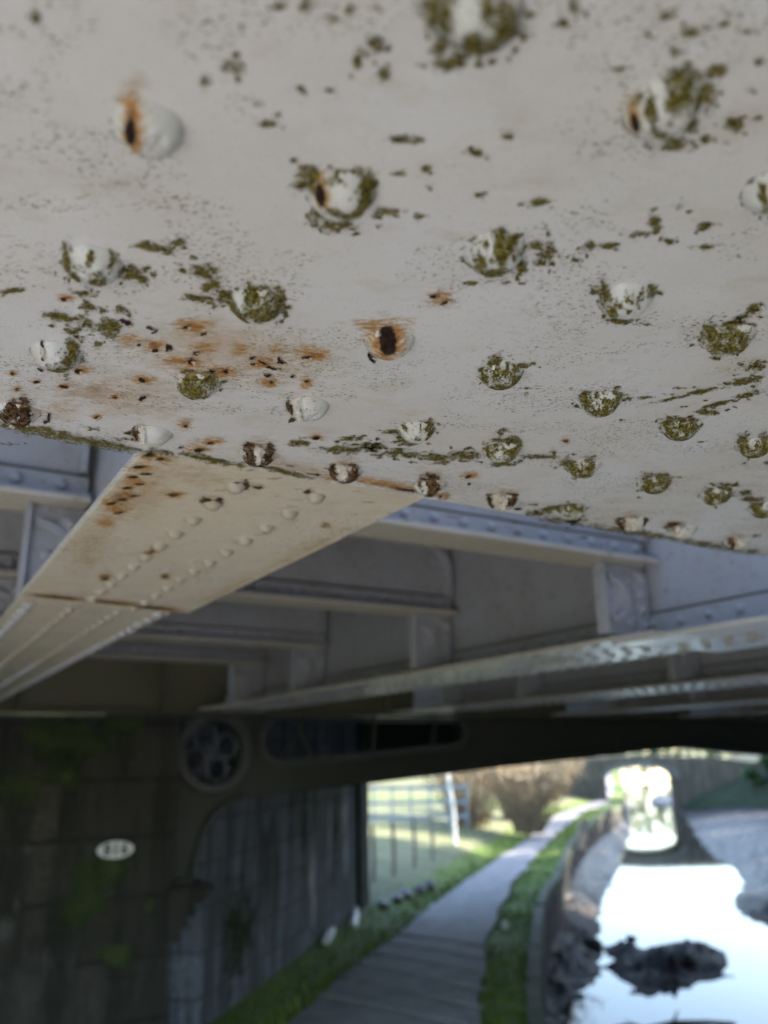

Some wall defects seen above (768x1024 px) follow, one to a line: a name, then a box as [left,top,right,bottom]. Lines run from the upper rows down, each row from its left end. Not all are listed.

corrosion [122,90,143,153]
corrosion [628,96,641,133]
corrosion [313,172,330,209]
corrosion [131,375,157,385]
corrosion [120,318,237,377]
corrosion [234,344,329,388]
corrosion [357,318,407,364]
corrosion [98,453,170,529]
corrosion [357,477,417,493]